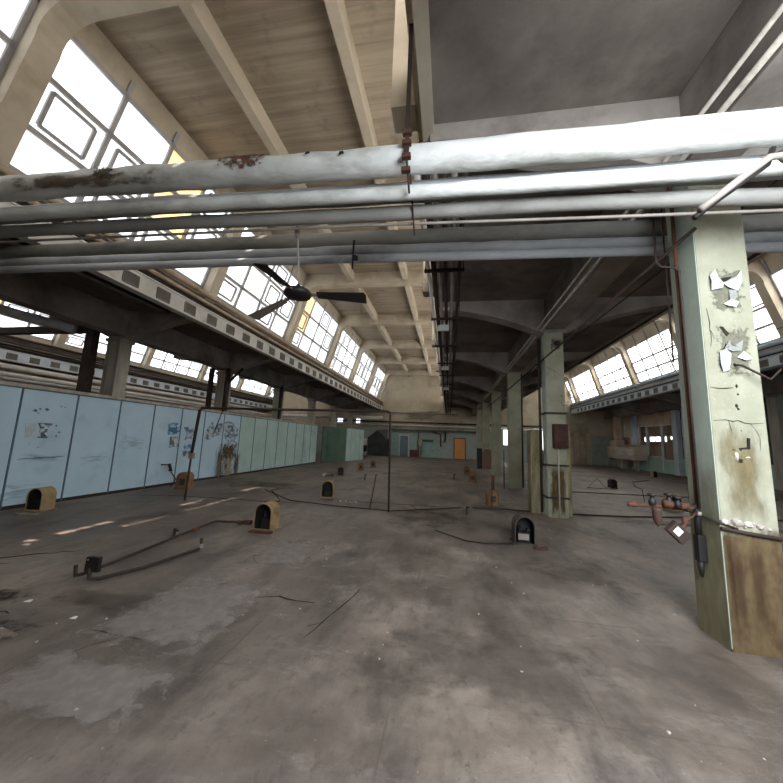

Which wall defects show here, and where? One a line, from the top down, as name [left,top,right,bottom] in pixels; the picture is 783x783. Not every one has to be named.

rust [217,153,264,169]
rust [15,172,145,190]
peeling [709,270,744,311]
peeling [716,326,753,375]
rust [215,443,238,477]
crack [0,550,81,564]
spalling [0,589,26,600]
crack [305,589,360,637]